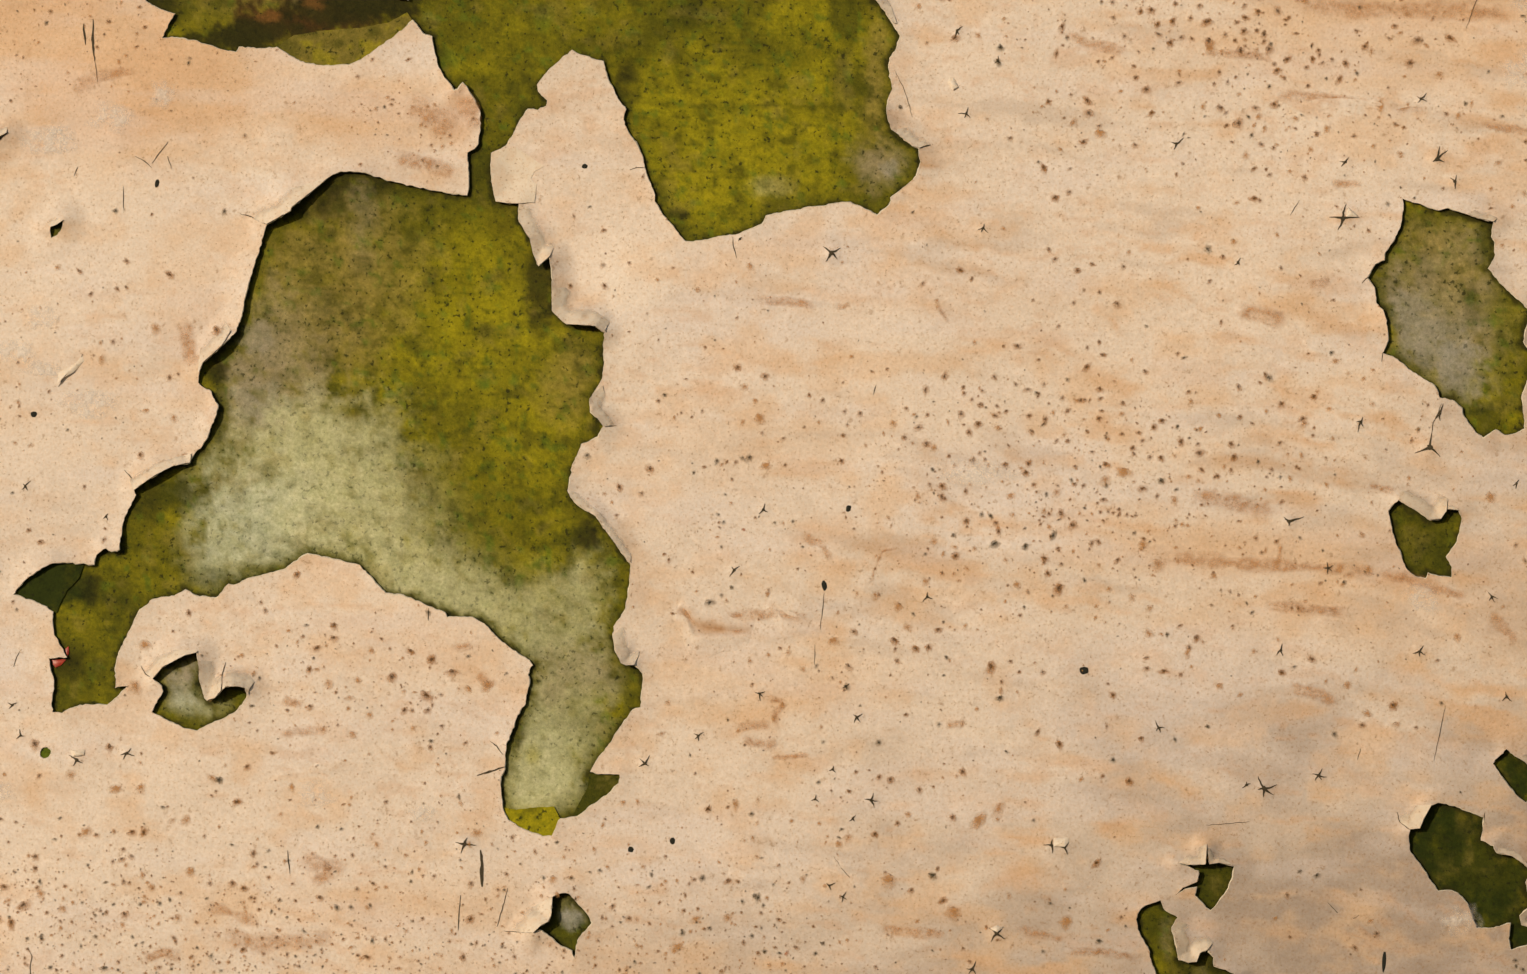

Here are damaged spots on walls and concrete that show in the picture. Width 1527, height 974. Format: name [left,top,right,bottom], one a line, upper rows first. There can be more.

peeling [1367,198,1527,438]
peeling [13,0,926,837]
peeling [1388,491,1462,579]
peeling [1493,749,1527,803]
peeling [516,893,592,958]
peeling [1136,844,1235,974]
peeling [1400,803,1527,950]